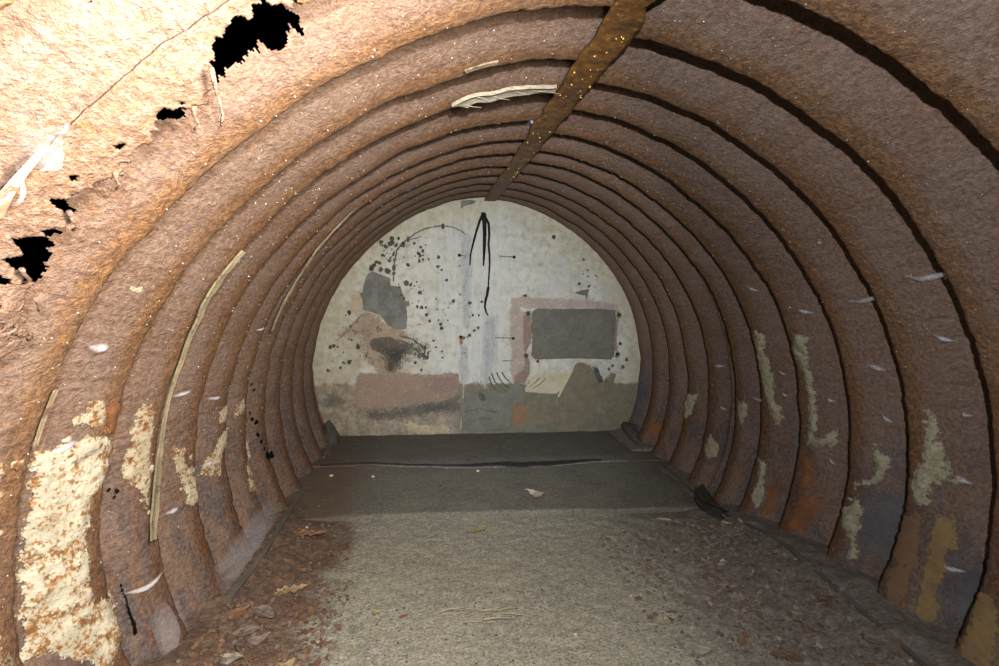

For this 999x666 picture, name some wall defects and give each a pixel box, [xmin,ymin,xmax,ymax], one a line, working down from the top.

peeling [208,66,225,127]
peeling [0,143,50,219]
peeling [66,210,80,231]
peeling [0,250,246,666]